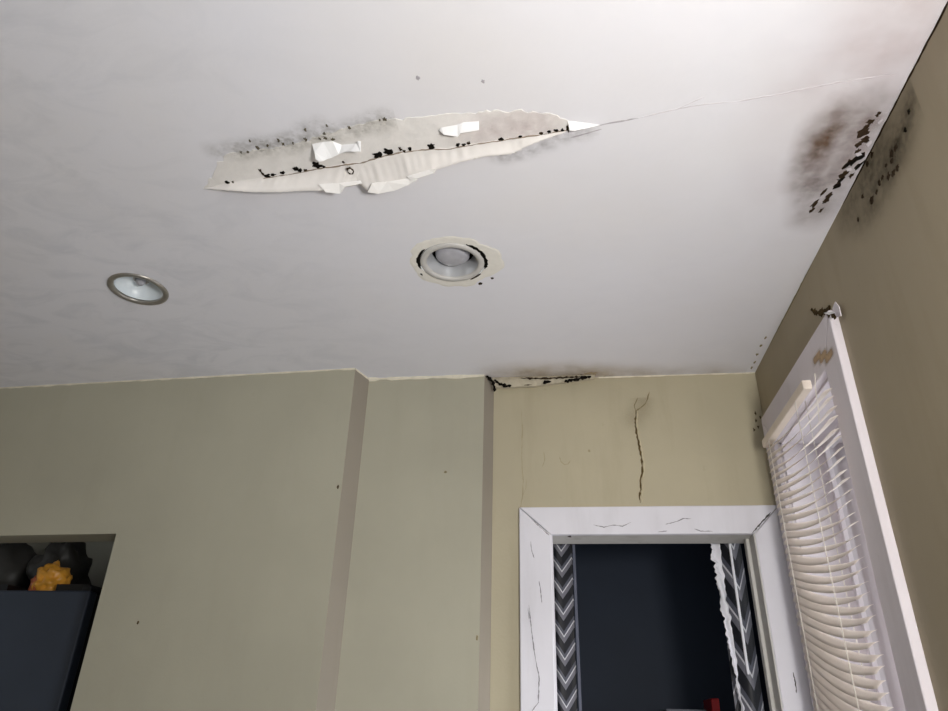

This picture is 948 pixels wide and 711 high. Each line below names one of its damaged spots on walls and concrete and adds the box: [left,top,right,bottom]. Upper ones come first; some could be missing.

damp [240,124,335,154]
peeling [203,109,599,194]
crack [569,1,948,204]
damp [808,112,907,213]
crack [770,268,810,344]
crack [595,394,649,528]